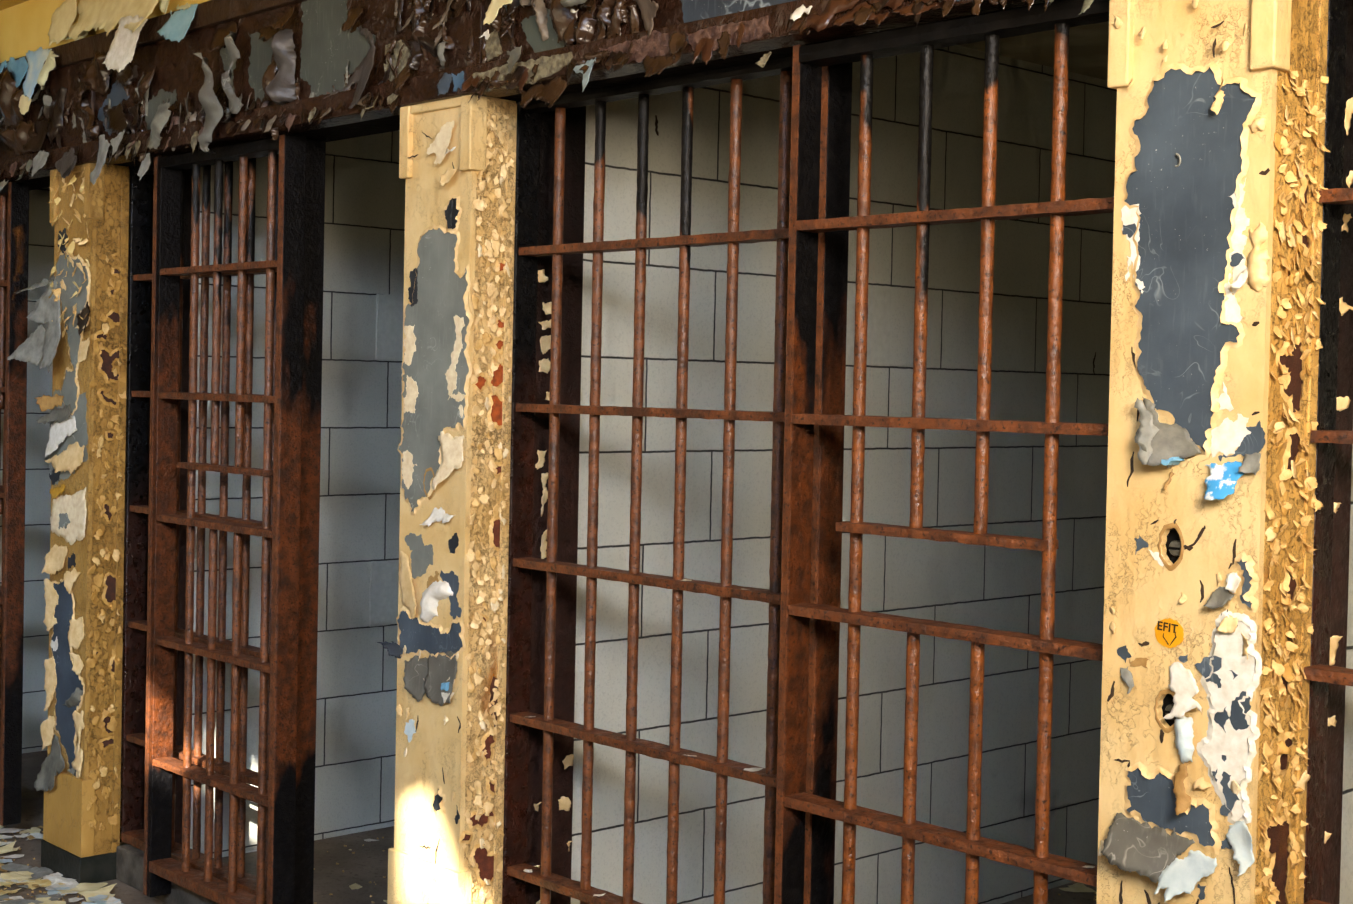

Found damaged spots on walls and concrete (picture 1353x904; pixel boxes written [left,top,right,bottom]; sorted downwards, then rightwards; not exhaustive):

peeling [0,0,1054,904]
peeling [1083,23,1353,904]